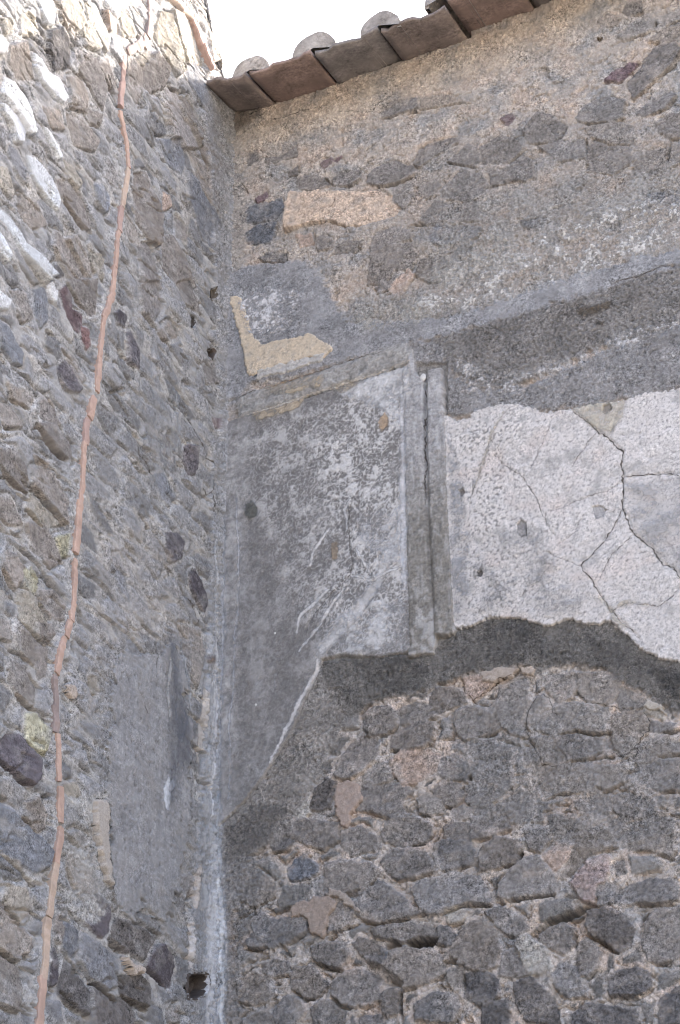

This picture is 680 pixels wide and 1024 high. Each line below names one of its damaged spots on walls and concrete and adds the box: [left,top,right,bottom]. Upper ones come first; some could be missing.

crack [421,391,429,503]
crack [469,408,680,639]
peeling [480,666,536,683]
peeling [644,699,667,716]
flaking render [334,780,363,829]
flaking render [291,888,360,939]